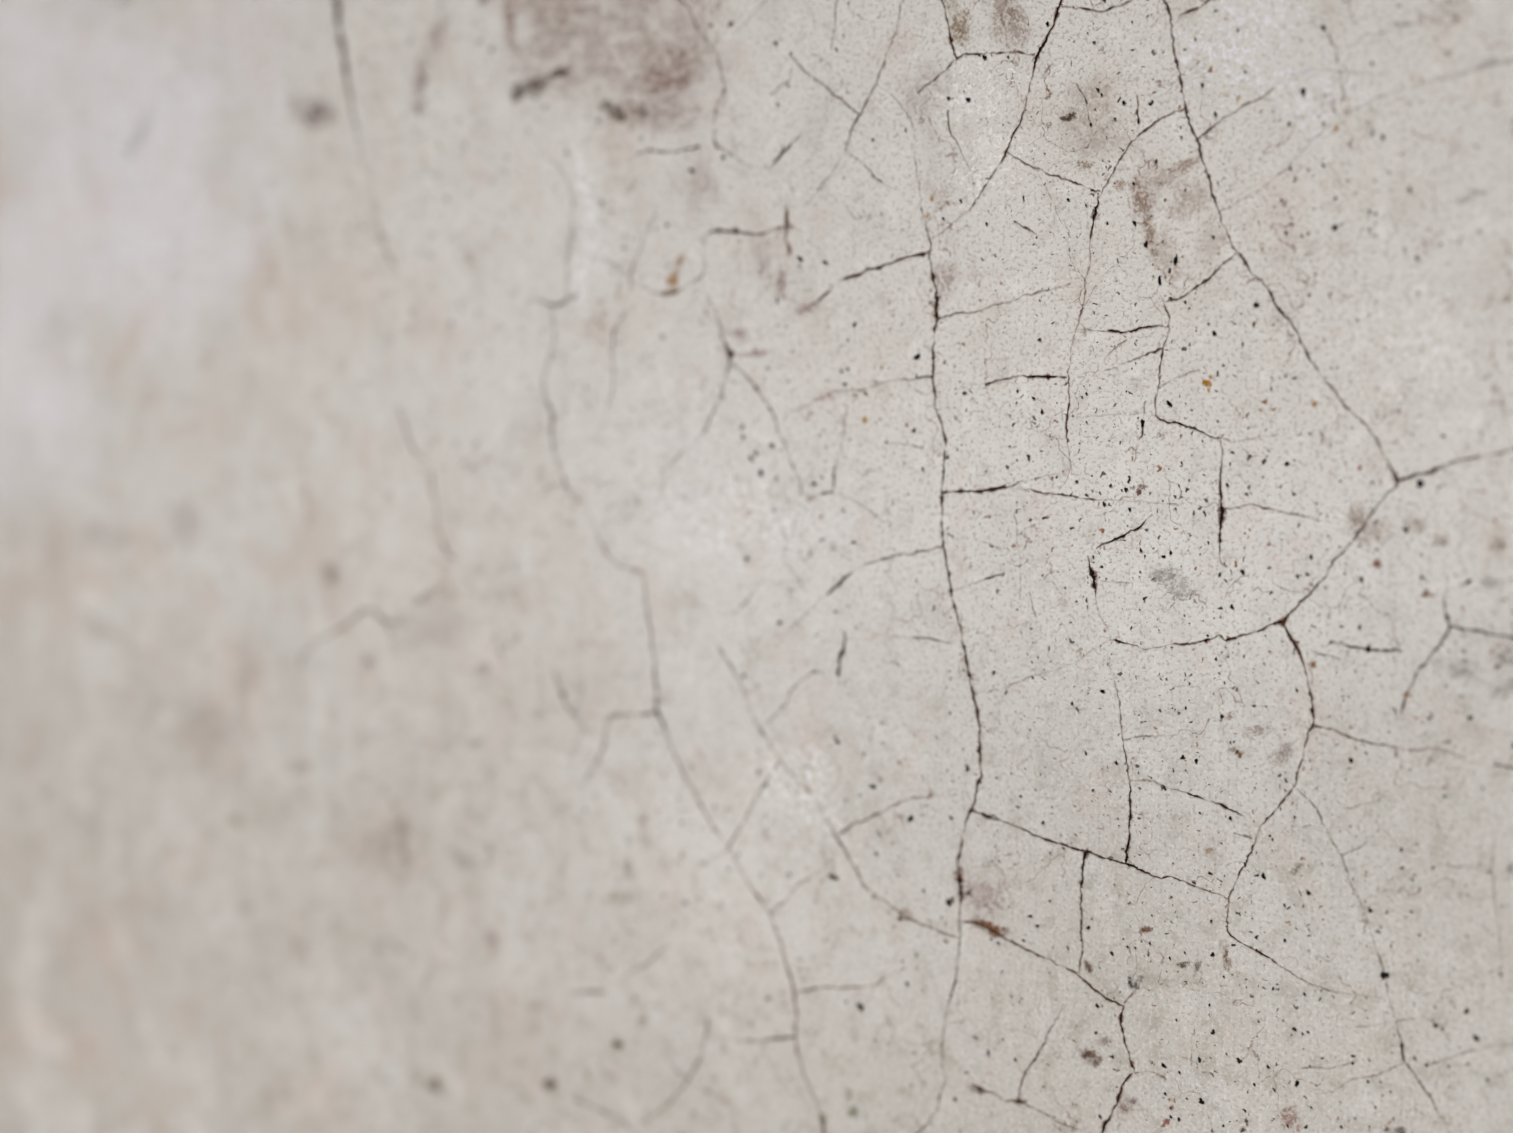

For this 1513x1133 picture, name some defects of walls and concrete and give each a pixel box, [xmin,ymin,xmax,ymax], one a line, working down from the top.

crack [332,0,397,267]
crack [555,0,1513,1133]